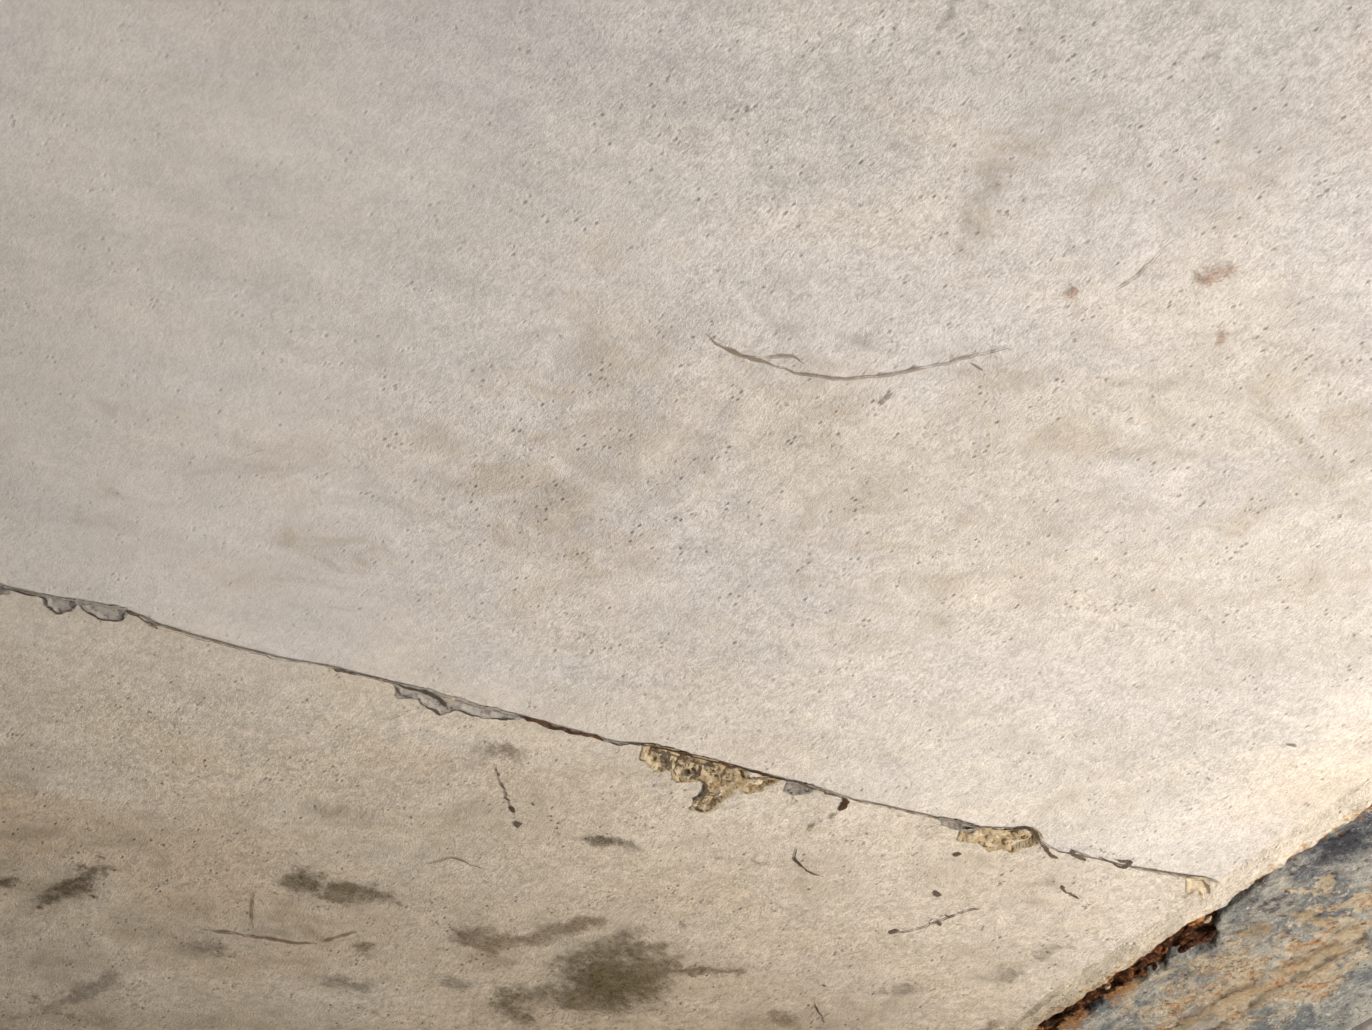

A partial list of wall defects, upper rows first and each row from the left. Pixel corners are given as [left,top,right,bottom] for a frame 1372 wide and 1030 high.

crack [708,335,1010,406]
crack [1,588,1218,899]
spalling [639,743,817,814]
leakage [458,917,743,1024]
corrosion [1036,910,1218,1030]
corrosion [1176,926,1372,1030]